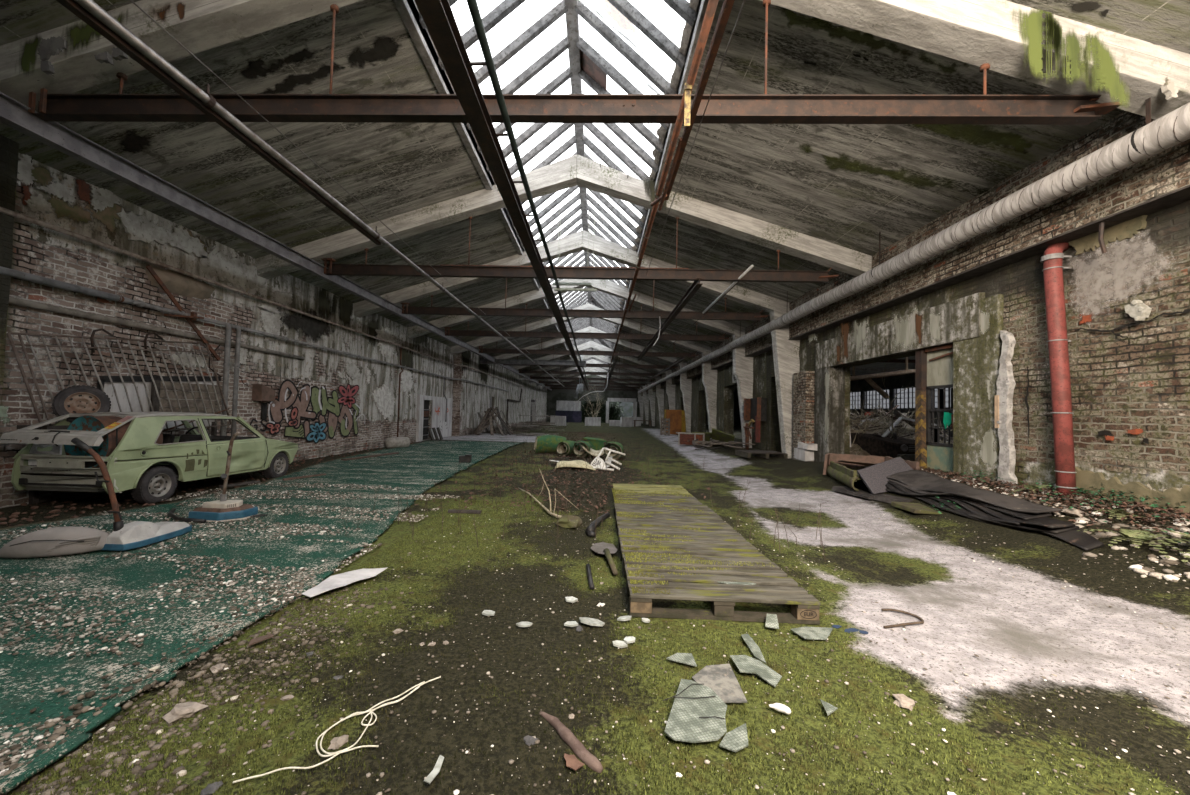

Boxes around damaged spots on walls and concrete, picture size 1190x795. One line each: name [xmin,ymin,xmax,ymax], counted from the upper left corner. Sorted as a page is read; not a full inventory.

damp [21,36,41,73]
damp [66,24,101,50]
damp [241,36,400,94]
damp [1020,9,1129,105]
flaking render [16,153,292,341]
peeling [1069,215,1147,255]
damp [980,313,989,334]
flaking render [337,326,414,419]
damp [980,429,999,467]